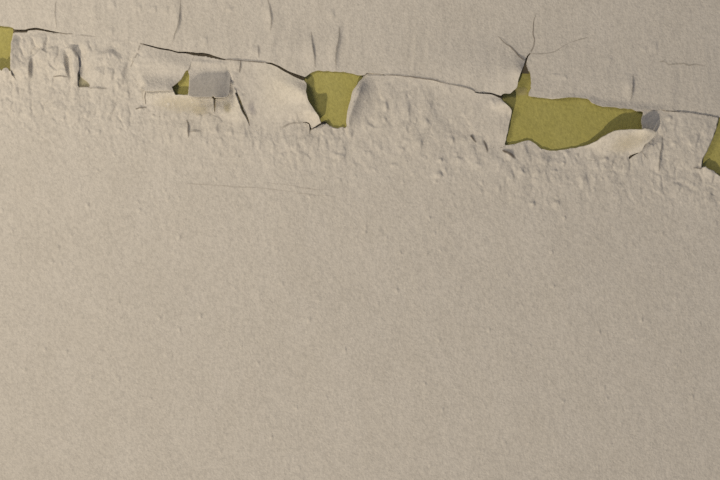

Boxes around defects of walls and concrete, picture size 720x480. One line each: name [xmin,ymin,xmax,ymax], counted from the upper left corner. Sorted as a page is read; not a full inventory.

crack [13,27,65,35]
peeling [0,26,89,91]
crack [144,44,227,60]
crack [250,61,305,80]
crack [516,53,530,74]
crack [236,93,249,122]
peeling [130,44,382,143]
peeling [437,36,720,192]